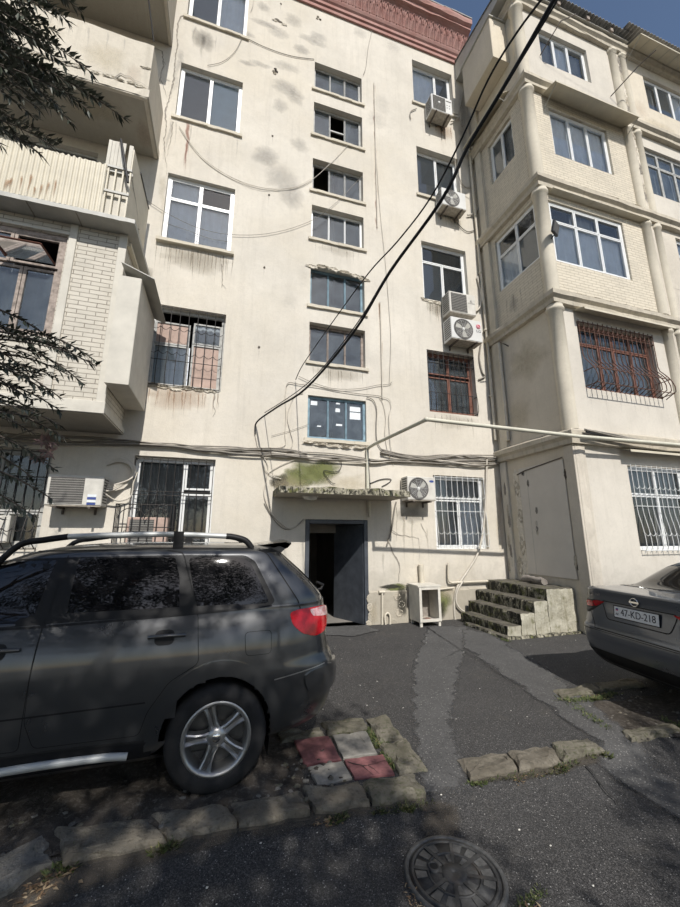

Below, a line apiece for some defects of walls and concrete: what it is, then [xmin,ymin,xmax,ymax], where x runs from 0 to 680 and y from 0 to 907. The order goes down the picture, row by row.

spalling [29,52,147,89]
spalling [305,264,370,282]